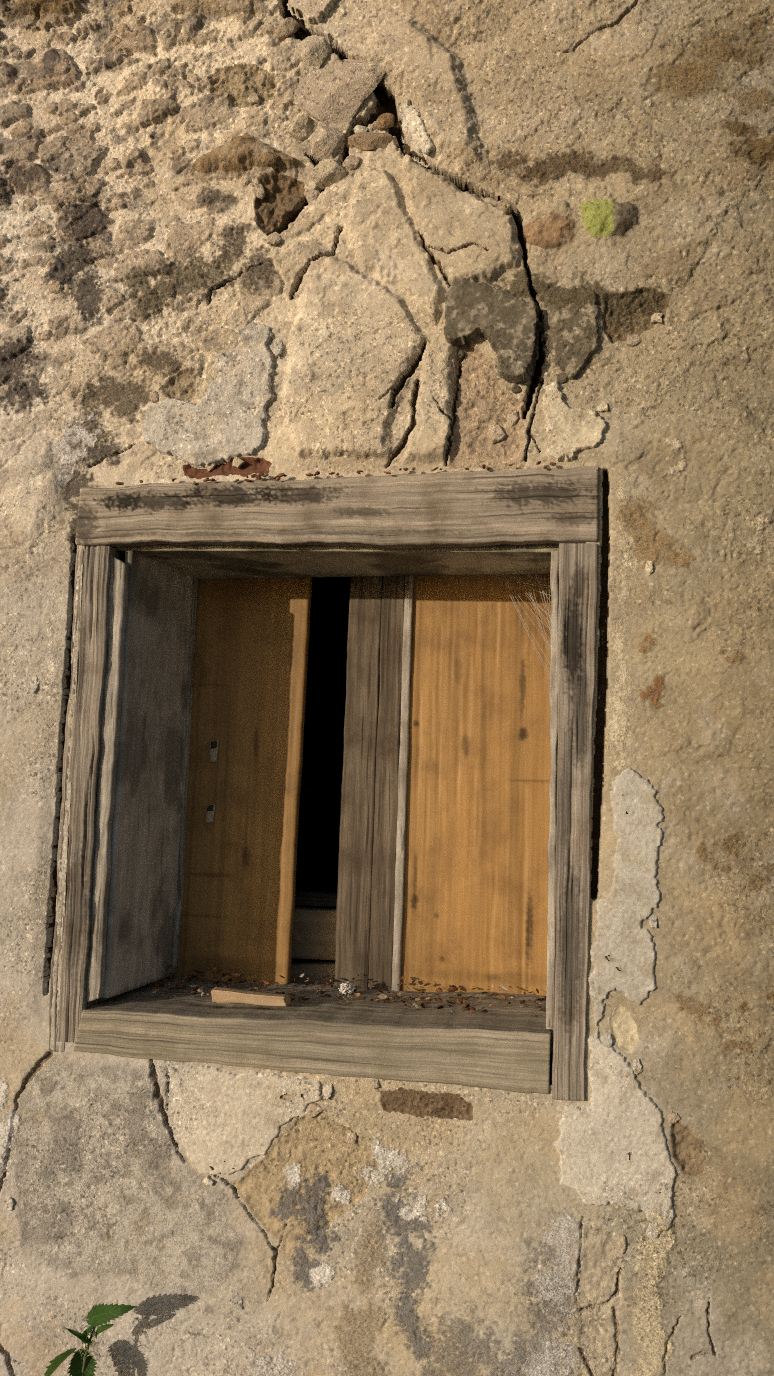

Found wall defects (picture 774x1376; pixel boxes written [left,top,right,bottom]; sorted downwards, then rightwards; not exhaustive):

crack [282,0,348,60]
crack [563,0,638,53]
crack [281,82,545,468]
peeling [142,322,283,479]
spalling [444,278,672,470]
peeling [553,473,706,1239]
crack [0,1052,53,1192]
peeling [7,1057,380,1310]
crack [149,1059,279,1292]
water stain [269,1137,584,1376]
crack [575,1222,622,1376]
spalling [577,1225,626,1376]